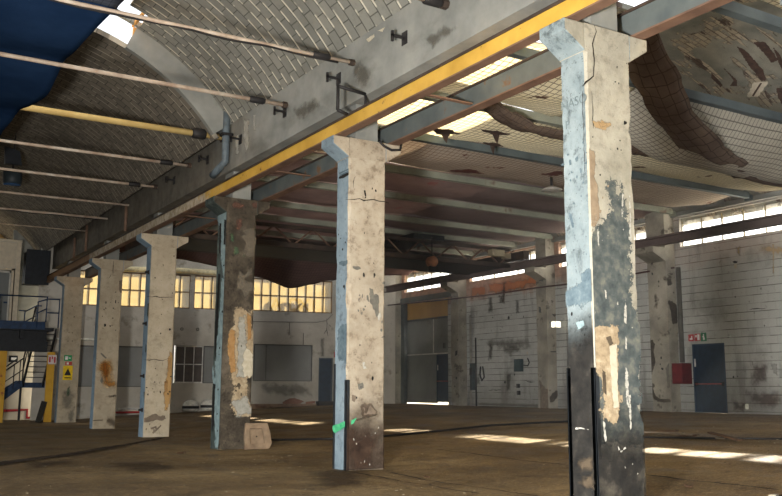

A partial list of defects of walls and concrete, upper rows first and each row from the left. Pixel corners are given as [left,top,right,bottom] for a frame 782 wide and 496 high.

flaking render [754,42,782,69]
flaking render [737,47,782,104]
peeling [562,136,670,439]
flaking render [212,212,254,449]
corrosion [99,361,115,386]
damp [753,366,766,382]
damp [734,394,778,411]